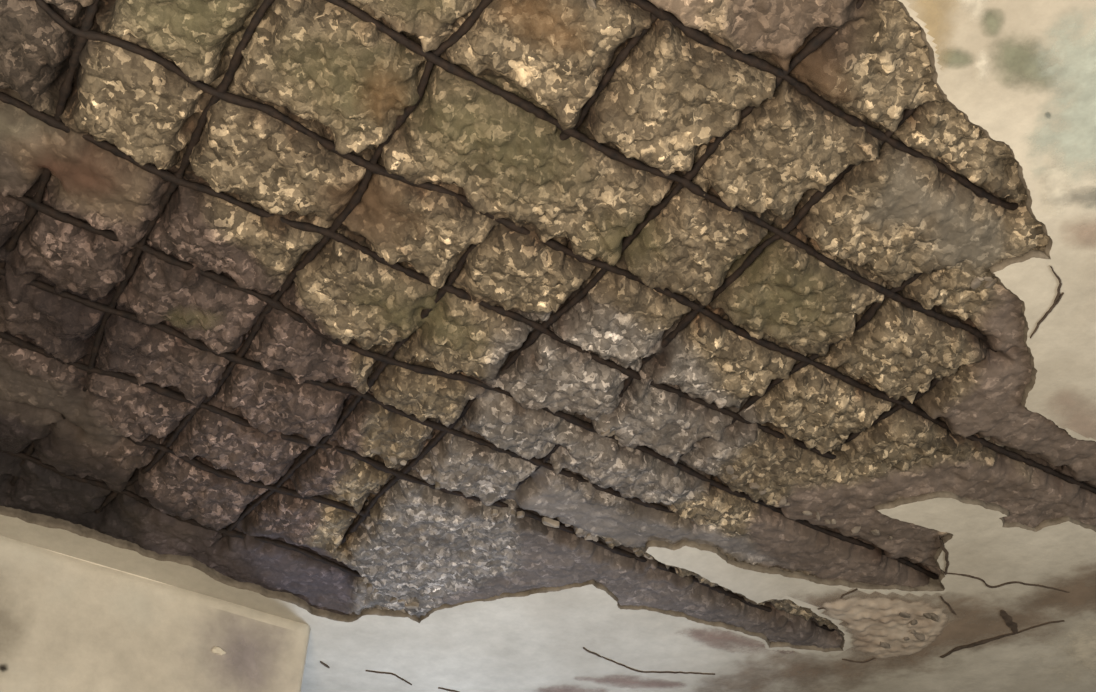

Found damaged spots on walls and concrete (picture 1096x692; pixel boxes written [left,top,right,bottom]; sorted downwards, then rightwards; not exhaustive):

spalling [0,0,77,117]
spalling [344,0,481,52]
water stain [921,0,986,74]
water stain [966,0,1000,34]
water stain [998,42,1051,85]
spalling [439,0,1053,329]
spalling [0,64,997,659]
flaking render [930,286,1096,488]
flaking render [748,453,1096,588]
crack [939,536,1070,658]